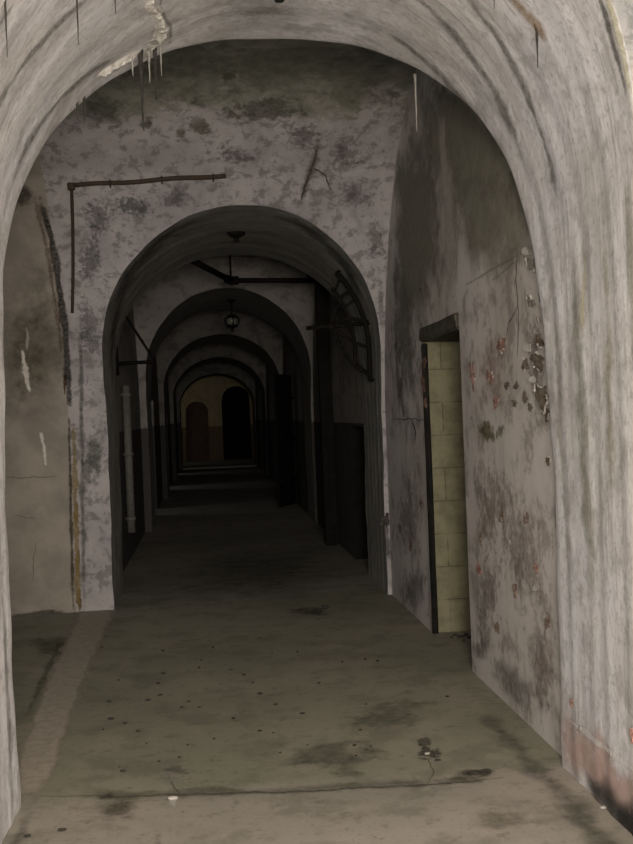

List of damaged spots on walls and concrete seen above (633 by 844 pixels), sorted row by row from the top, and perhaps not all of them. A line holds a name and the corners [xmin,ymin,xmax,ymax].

flaking render [96,0,170,78]
leakage [445,24,515,132]
leakage [483,19,535,116]
corrosion [504,0,544,36]
leakage [540,118,556,184]
leakage [591,783,633,836]